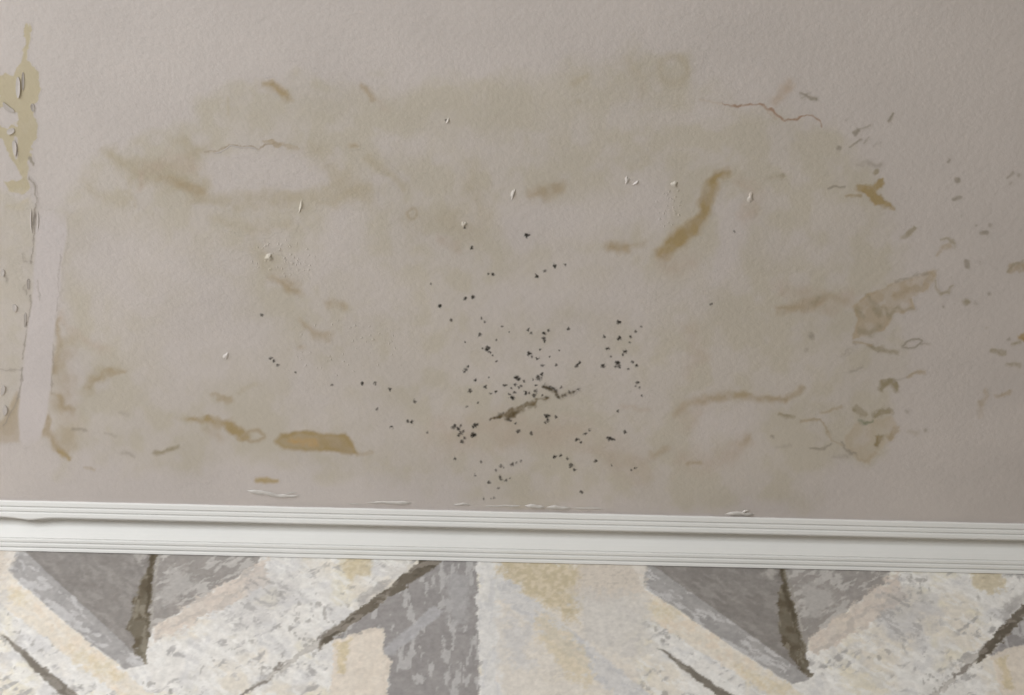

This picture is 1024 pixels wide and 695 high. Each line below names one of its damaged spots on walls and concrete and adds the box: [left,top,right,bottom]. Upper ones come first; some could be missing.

peeling [0,22,42,214]
crack [203,138,301,154]
crack [698,97,823,129]
peeling [826,118,897,212]
leakage [0,27,917,517]